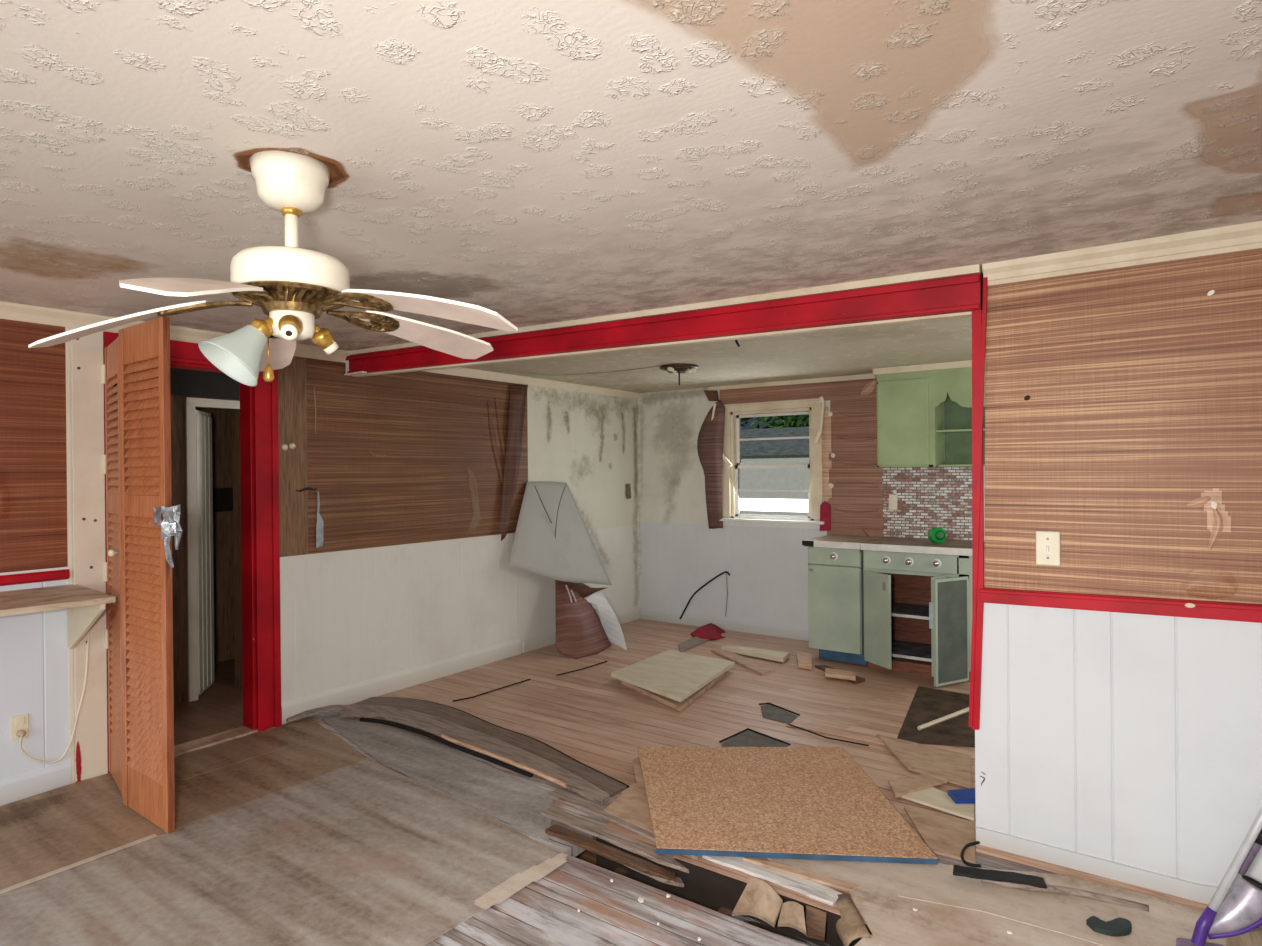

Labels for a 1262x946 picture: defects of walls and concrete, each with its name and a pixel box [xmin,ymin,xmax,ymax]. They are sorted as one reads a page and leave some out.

peeling [704,390,719,401]